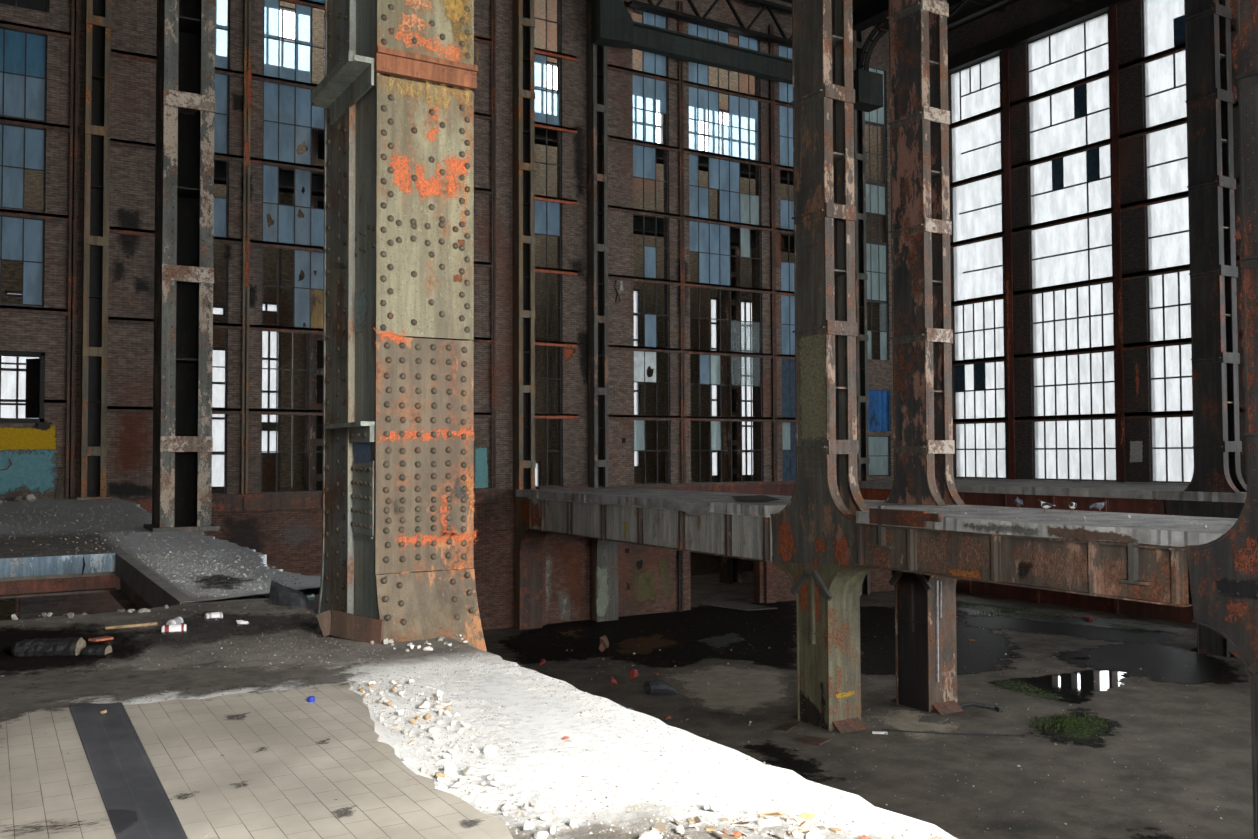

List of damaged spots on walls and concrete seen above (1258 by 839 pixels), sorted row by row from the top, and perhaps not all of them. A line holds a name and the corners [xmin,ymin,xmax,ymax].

corrosion [440,0,477,61]
peeling [0,422,57,498]
corrosion [460,468,475,510]
corrosion [800,682,828,730]
water stain [1128,827,1174,839]